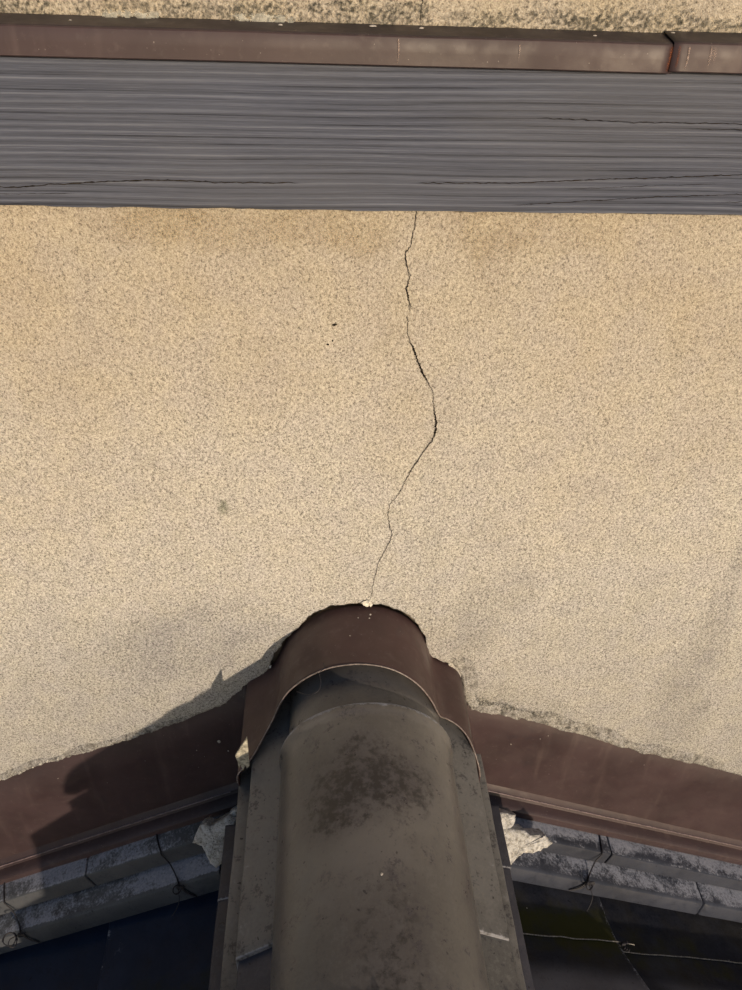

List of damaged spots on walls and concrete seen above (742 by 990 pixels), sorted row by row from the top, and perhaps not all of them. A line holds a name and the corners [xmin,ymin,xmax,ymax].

crack [550,118,742,130]
crack [422,174,742,205]
crack [359,211,438,607]